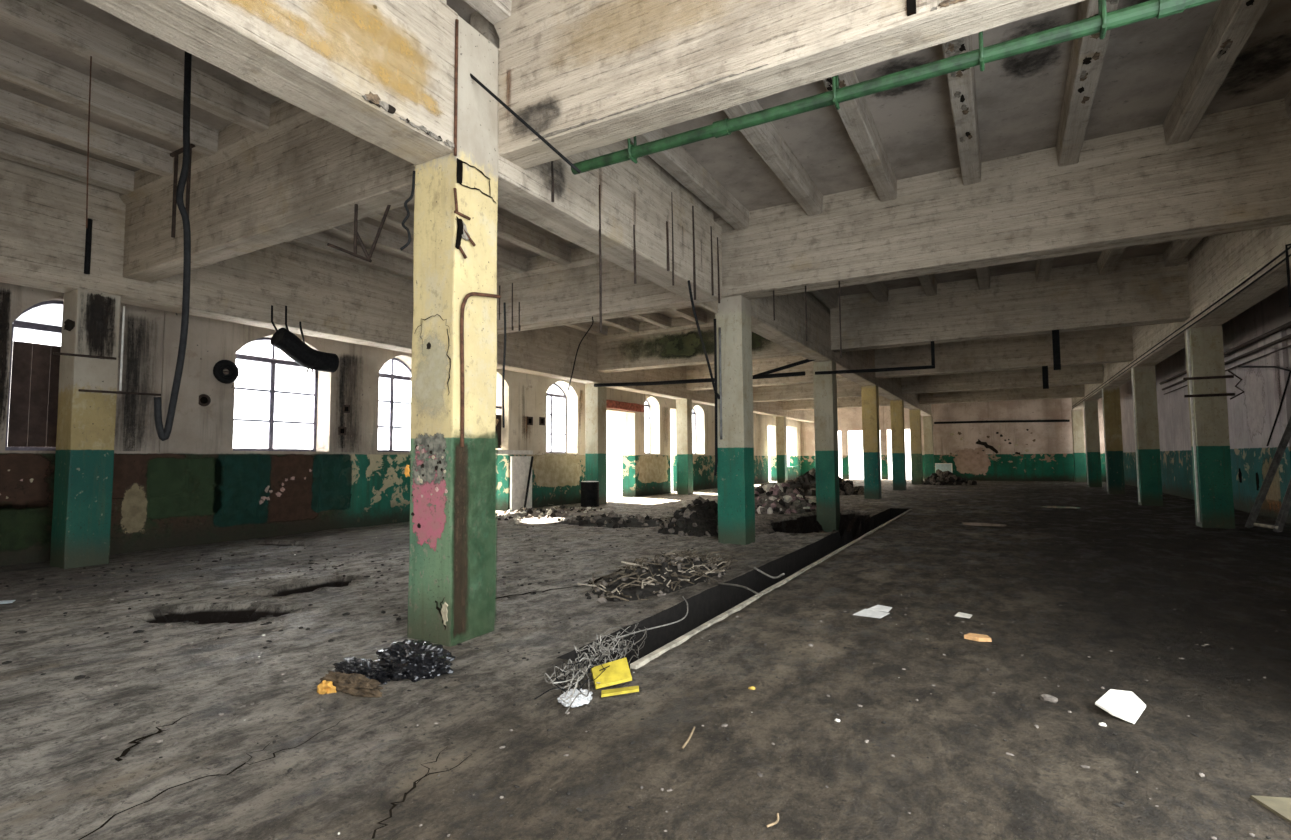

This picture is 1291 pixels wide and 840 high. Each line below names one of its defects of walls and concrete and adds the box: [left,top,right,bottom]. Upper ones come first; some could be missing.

damp [243,0,436,113]
damp [1004,47,1057,75]
damp [1013,22,1054,39]
spalling [455,216,470,249]
damp [0,289,11,423]
peeling [0,453,54,510]
peeling [404,433,448,551]
crack [78,713,353,840]
crack [372,748,472,839]